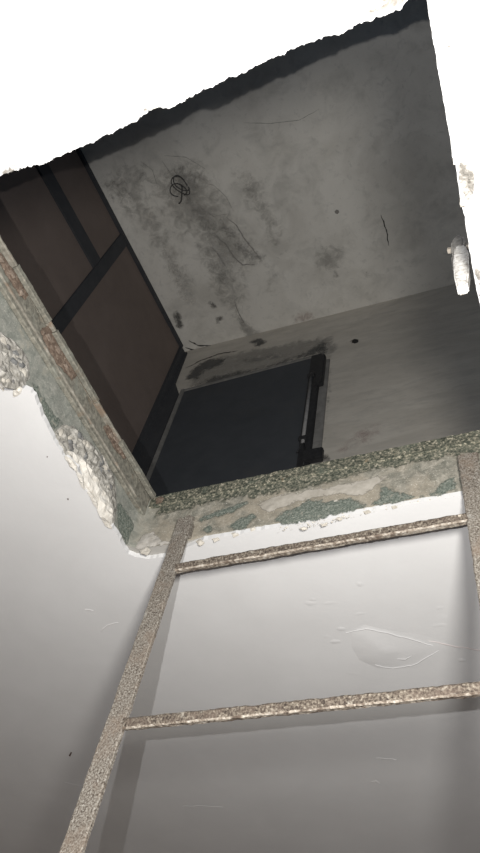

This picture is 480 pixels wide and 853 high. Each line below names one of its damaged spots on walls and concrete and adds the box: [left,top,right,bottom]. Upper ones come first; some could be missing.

spalling [0,332,170,555]